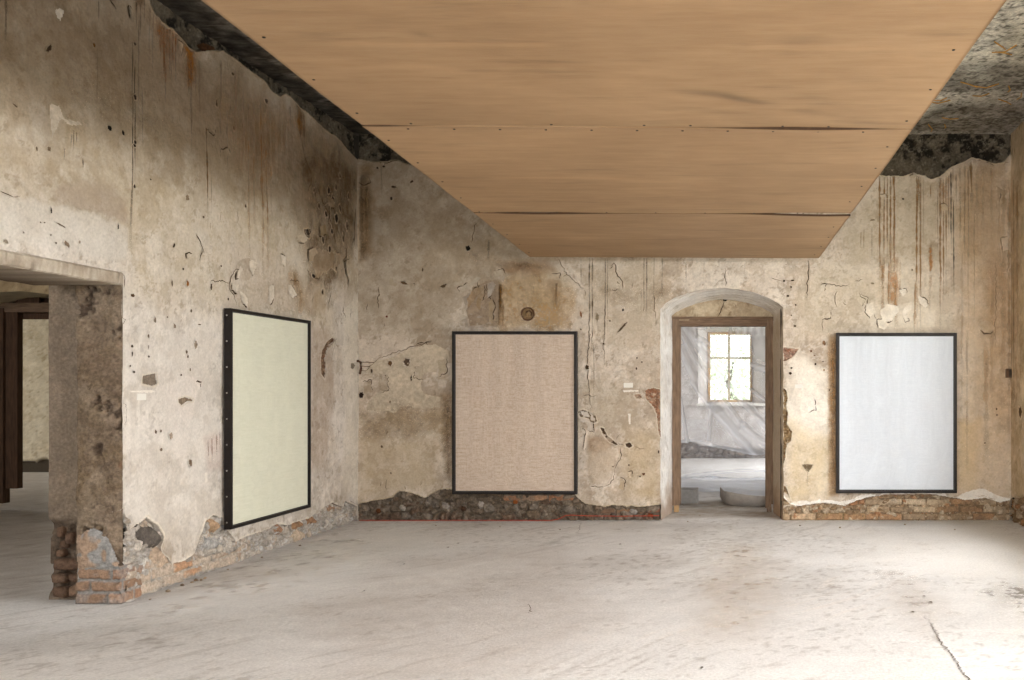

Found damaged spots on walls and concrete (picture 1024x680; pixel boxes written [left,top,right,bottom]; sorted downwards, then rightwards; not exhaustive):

flaking render [147,0,415,201]
flaking render [879,134,1011,181]
crack [558,258,658,450]
rust [878,176,898,306]
peeling [857,282,937,330]
rust [914,178,949,319]
flaking render [633,386,661,454]
flaking render [52,464,660,604]
flaking render [783,484,1024,526]
crack [930,622,974,680]